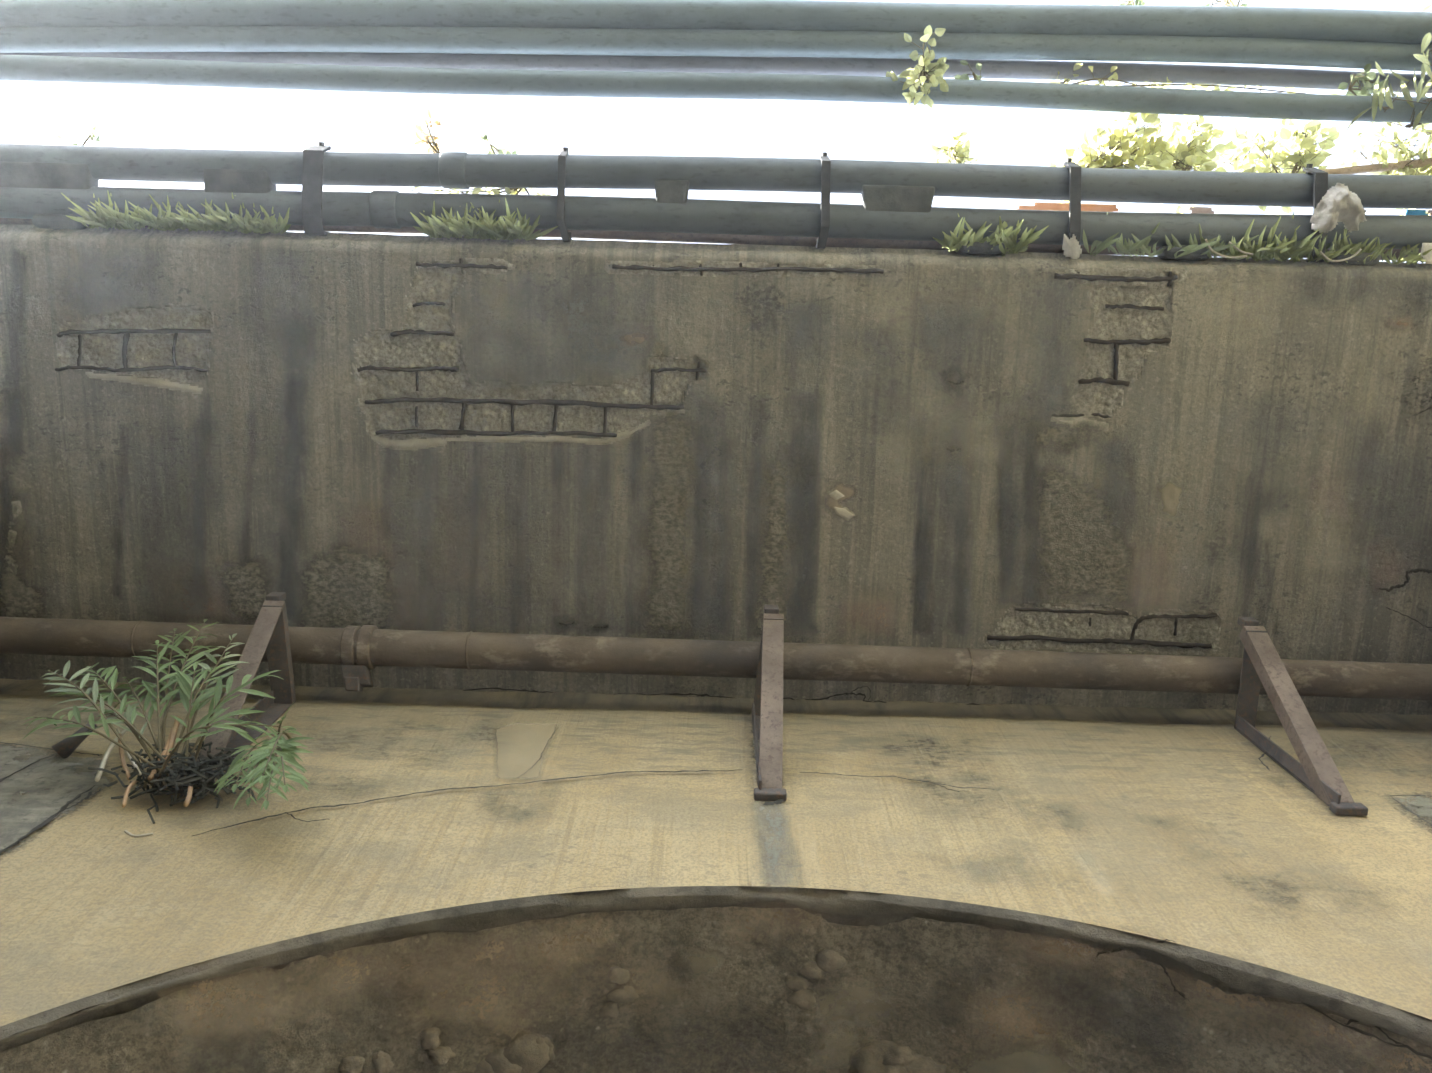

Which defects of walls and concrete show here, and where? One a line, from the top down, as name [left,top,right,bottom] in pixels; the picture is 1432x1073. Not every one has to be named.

spalling [55,303,214,394]
spalling [350,258,710,450]
spalling [1050,267,1189,431]
spalling [982,601,1225,655]
crack [0,742,102,853]
crack [193,727,740,836]